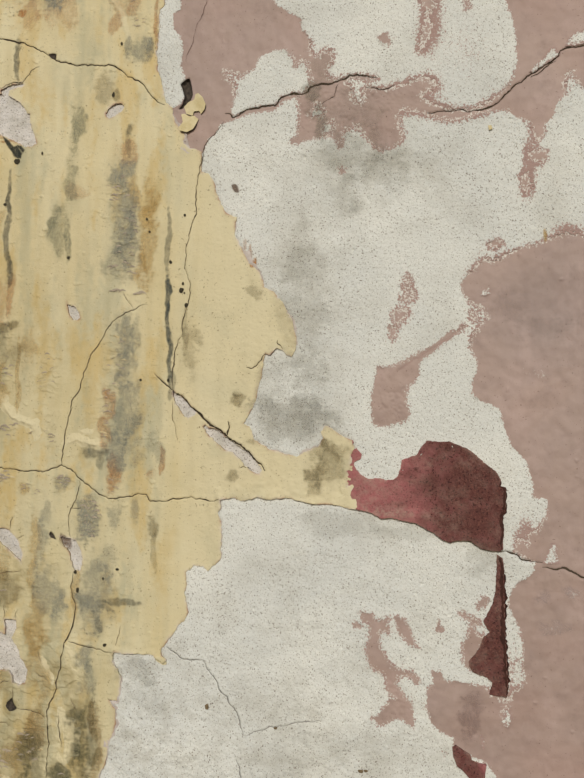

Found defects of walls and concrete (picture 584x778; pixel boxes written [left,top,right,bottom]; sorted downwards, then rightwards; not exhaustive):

spalling [0,84,36,147]
peeling [157,0,206,132]
peeling [273,0,518,111]
crack [431,45,584,114]
peeling [530,29,584,73]
crack [155,73,392,471]
leakage [165,279,188,382]
crack [0,293,219,527]
peeling [100,48,584,778]
crack [501,551,584,578]
crack [166,646,319,736]